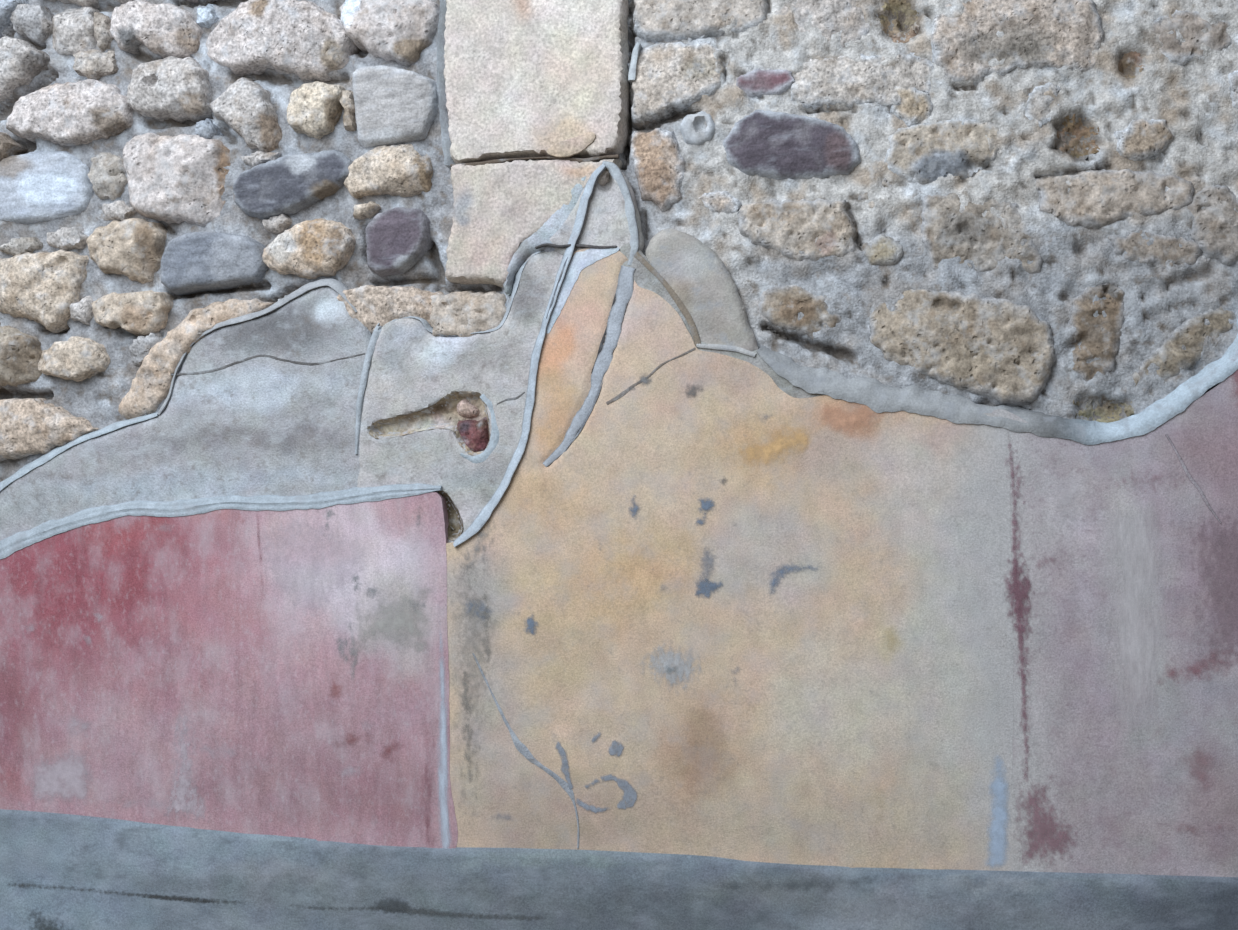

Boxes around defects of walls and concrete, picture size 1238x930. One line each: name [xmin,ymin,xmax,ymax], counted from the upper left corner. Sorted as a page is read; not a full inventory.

crack [171,353,365,376]
flaking render [0,168,823,543]
crack [535,243,696,467]
crack [472,653,637,848]